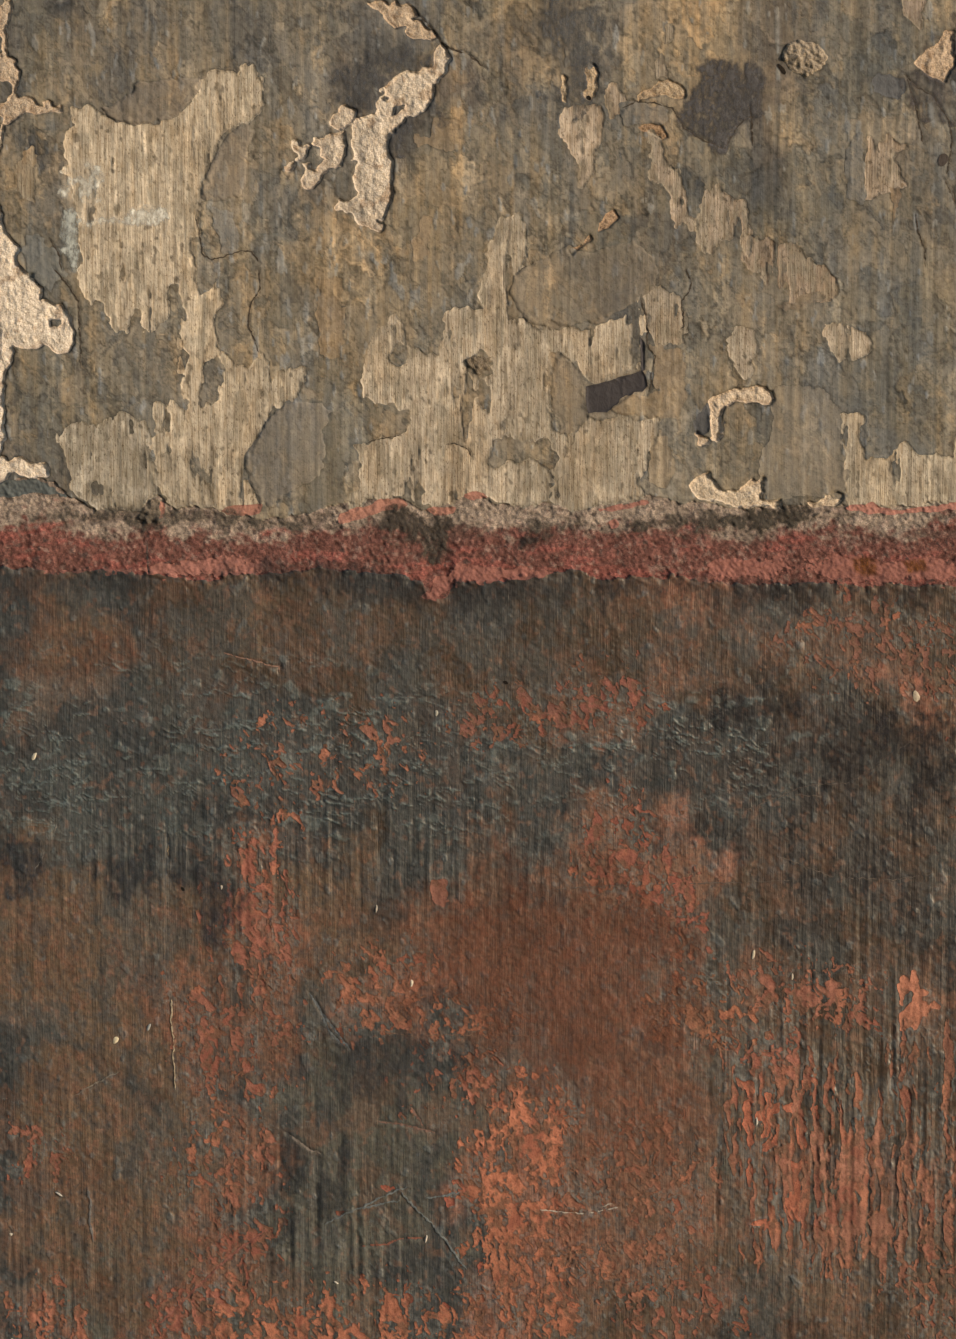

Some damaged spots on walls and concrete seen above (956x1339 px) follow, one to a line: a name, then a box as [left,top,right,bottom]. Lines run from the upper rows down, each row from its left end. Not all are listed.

peeling [0,0,331,518]
flaking render [284,0,452,232]
peeling [558,23,686,189]
peeling [638,124,840,304]
peeling [844,132,908,205]
peeling [902,0,927,30]
flaking render [914,30,956,83]
peeling [338,210,688,529]
flaking render [693,326,774,446]
peeling [822,322,873,363]
flaking render [689,472,782,509]
peeling [807,412,956,515]